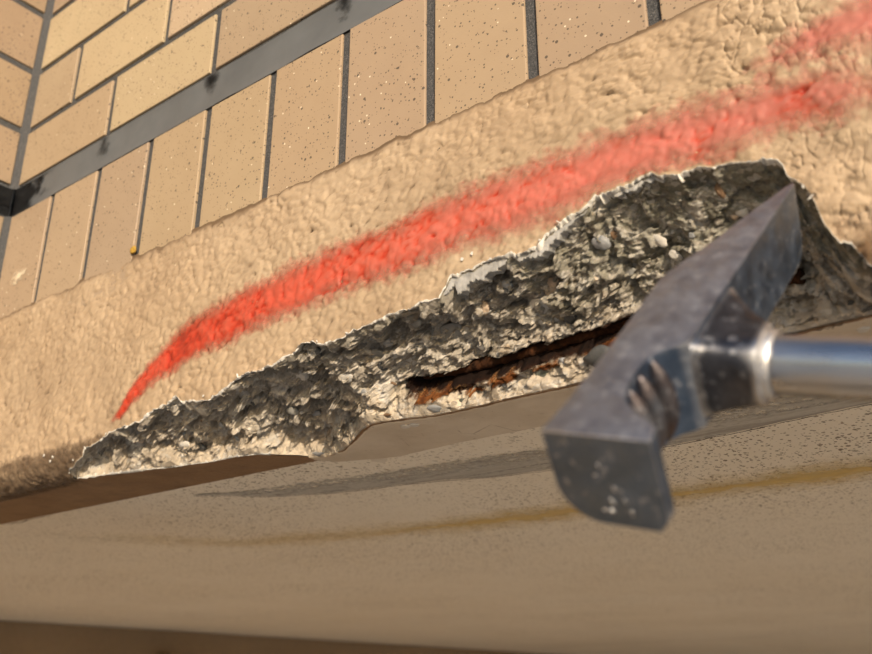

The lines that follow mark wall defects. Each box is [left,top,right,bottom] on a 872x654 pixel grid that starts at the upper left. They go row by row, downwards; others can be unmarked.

spalling [69,157,872,479]
corrosion [405,314,634,405]